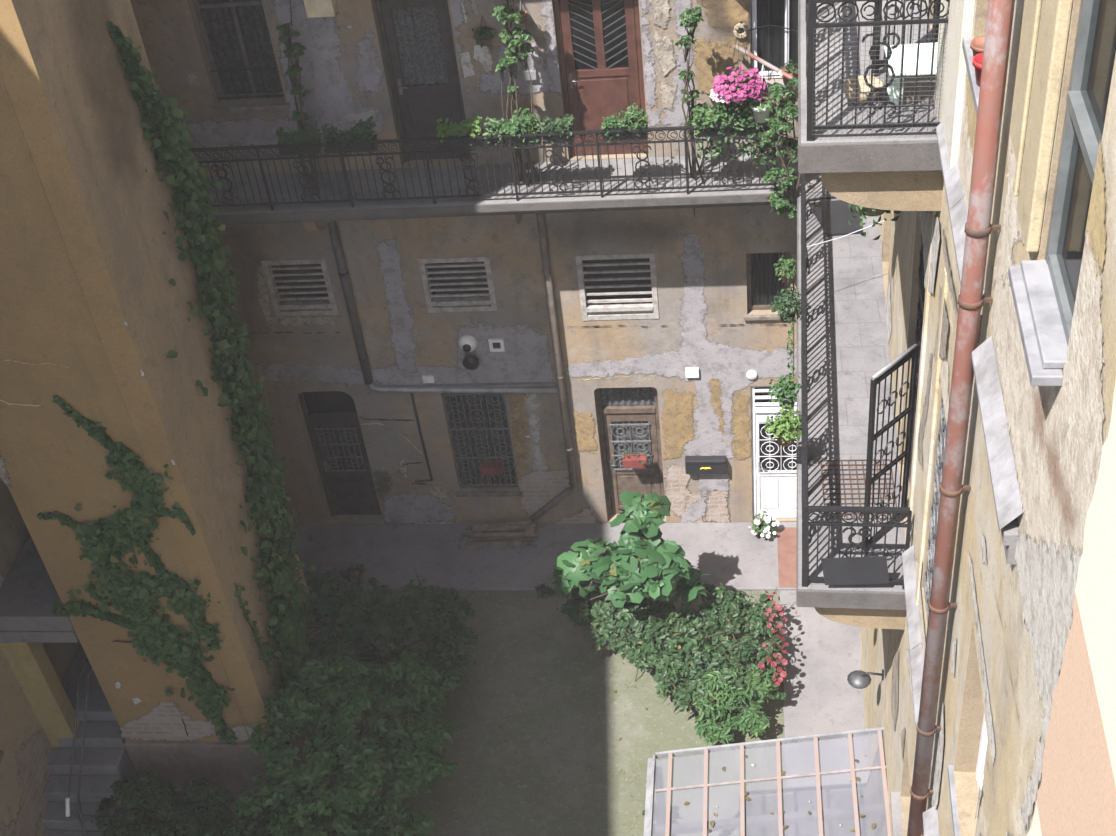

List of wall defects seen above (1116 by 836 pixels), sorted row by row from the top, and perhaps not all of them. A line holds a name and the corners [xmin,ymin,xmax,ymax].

peeling [459,45,493,78]
spalling [662,389,731,523]
peeling [708,378,751,460]
spalling [991,140,1106,836]
peeling [968,533,996,766]
spalling [119,698,216,742]
peeling [931,704,944,810]